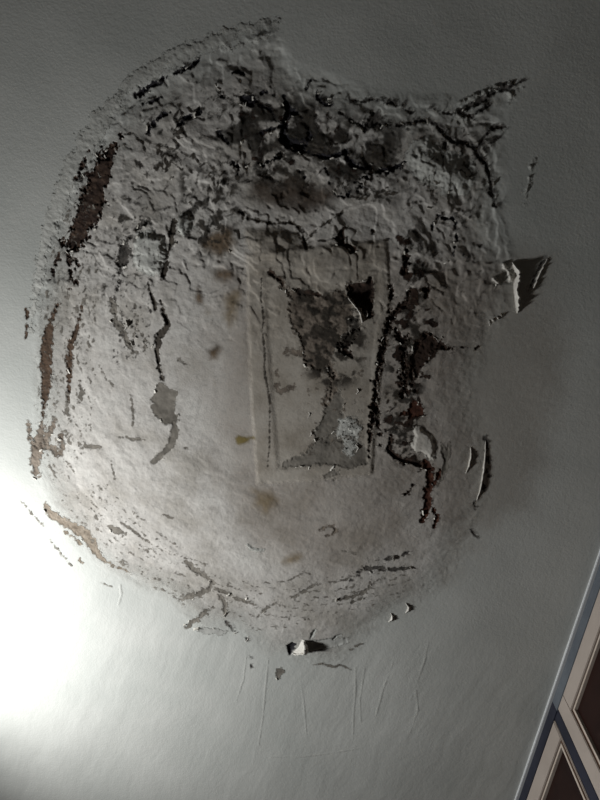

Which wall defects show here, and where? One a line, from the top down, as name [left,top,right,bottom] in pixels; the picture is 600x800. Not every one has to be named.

crack [148,218,178,381]
crack [260,278,270,467]
peeling [24,53,524,655]
leakage [223,95,399,209]
leakage [297,291,365,386]
crack [153,79,527,257]
crack [367,246,431,496]
leakage [385,263,427,454]
rust [399,398,425,419]
leakage [405,229,429,251]
rust [419,459,441,529]